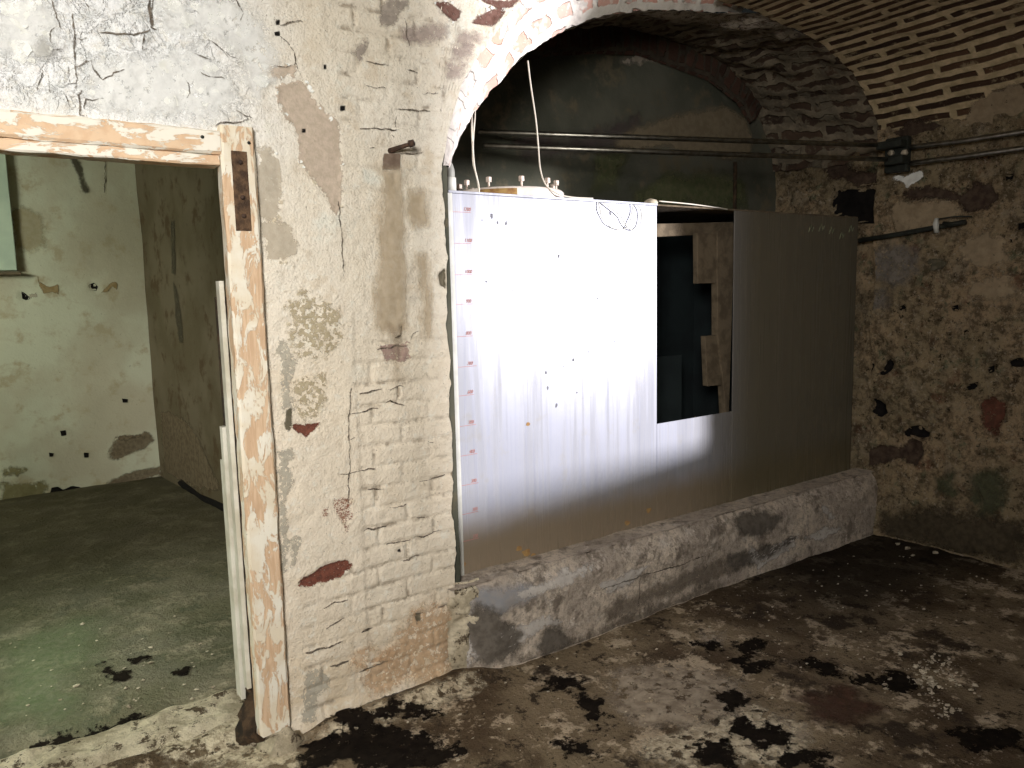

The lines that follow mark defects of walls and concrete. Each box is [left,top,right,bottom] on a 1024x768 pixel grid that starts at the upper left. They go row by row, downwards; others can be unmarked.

spalling [473,0,518,27]
crack [37,0,157,116]
crack [187,39,235,96]
crack [216,110,252,126]
flaking render [157,0,345,215]
peeling [284,290,343,438]
crack [344,385,435,561]
spalling [297,560,352,588]
damp [689,635,780,674]
damp [296,694,468,768]
damp [529,671,617,759]
damp [683,688,836,768]